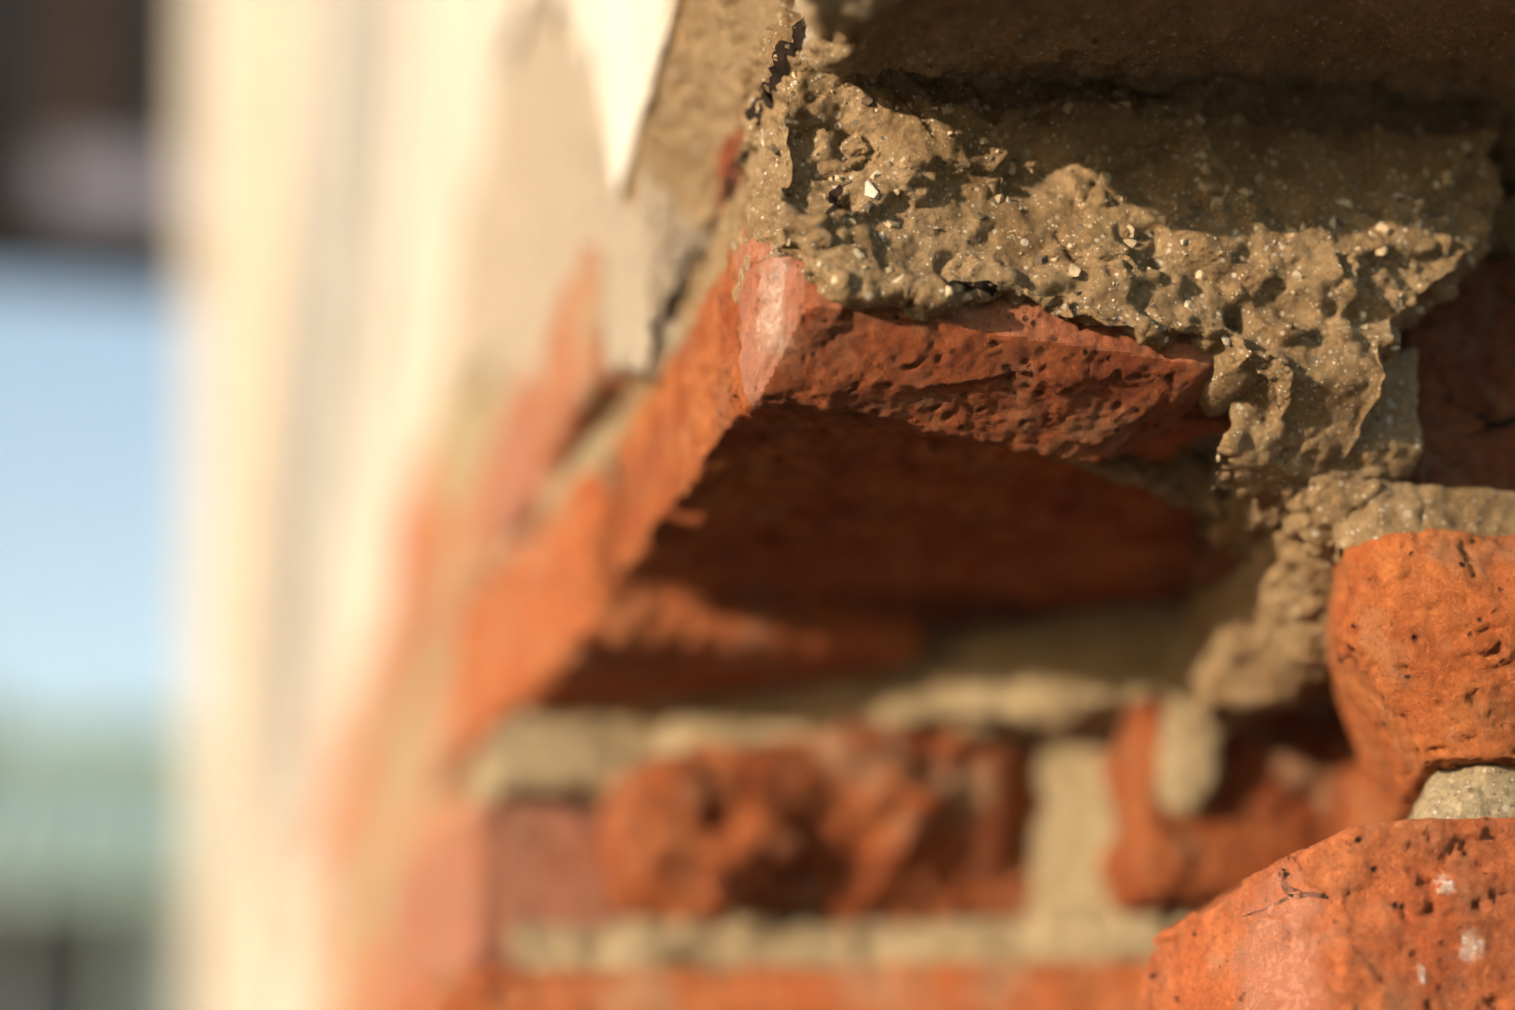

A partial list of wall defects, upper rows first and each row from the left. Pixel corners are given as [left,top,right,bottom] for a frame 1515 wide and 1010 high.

crack [649,16,806,351]
spalling [444,0,1515,405]
spalling [735,238,1212,463]
crack [1445,402,1515,439]
spalling [1234,873,1324,1010]